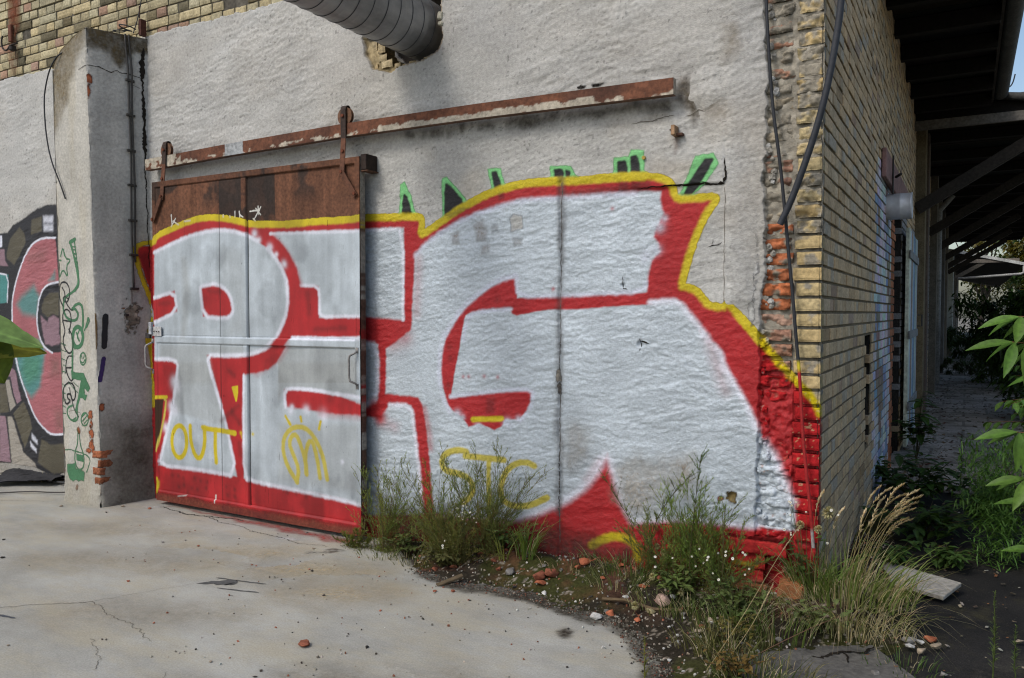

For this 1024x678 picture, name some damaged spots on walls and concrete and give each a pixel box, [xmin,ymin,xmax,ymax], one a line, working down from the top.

spalling [369,41,428,70]
crack [80,48,150,268]
crack [641,158,727,301]
spalling [748,0,827,543]
spalling [77,403,113,494]